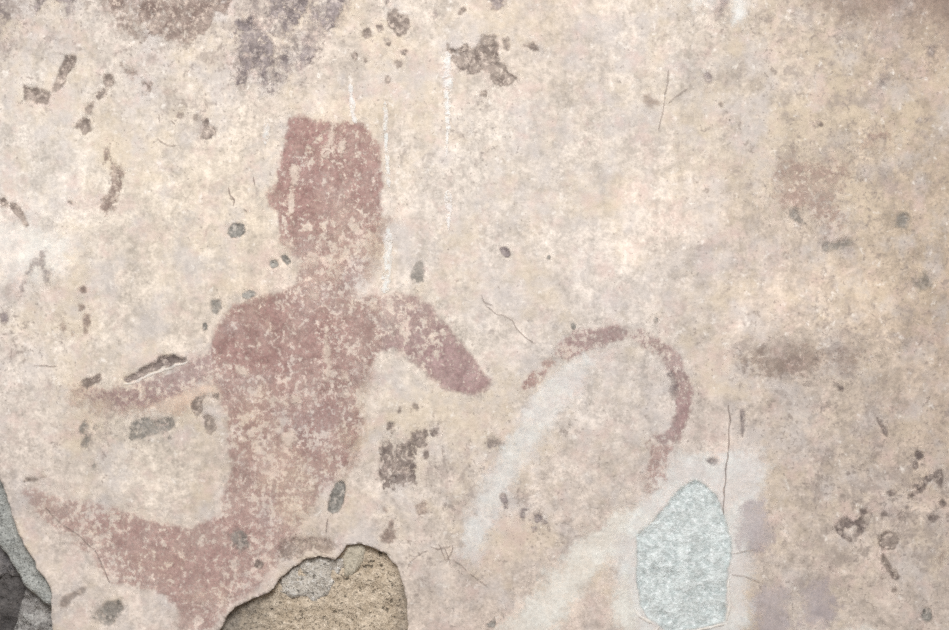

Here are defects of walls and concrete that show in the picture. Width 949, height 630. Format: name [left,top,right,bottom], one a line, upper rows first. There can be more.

peeling [323,326,349,381]
flaking render [130,418,174,439]
flaking render [191,393,218,434]
flaking render [328,481,345,513]
flaking render [0,480,80,630]
flaking render [220,509,408,630]
flaking render [93,599,123,624]